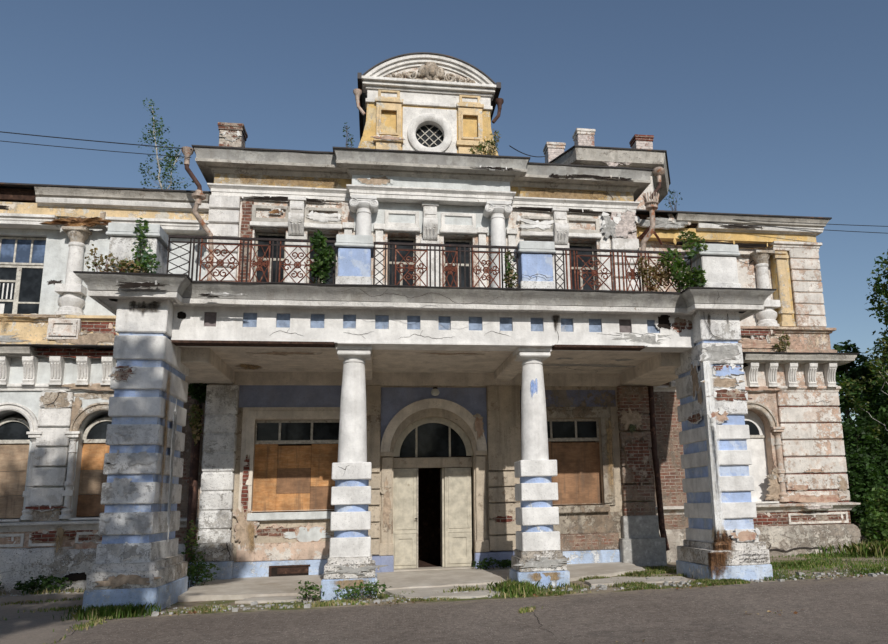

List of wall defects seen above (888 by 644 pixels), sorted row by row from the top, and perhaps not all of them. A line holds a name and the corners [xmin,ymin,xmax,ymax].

flaking render [39,212,112,228]
flaking render [55,322,117,345]
peeling [612,315,693,345]
flaking render [39,366,137,424]
flaking render [687,329,784,424]
flaking render [233,454,334,553]
flaking render [29,512,151,561]
rust [708,526,733,579]
peeling [85,571,165,589]